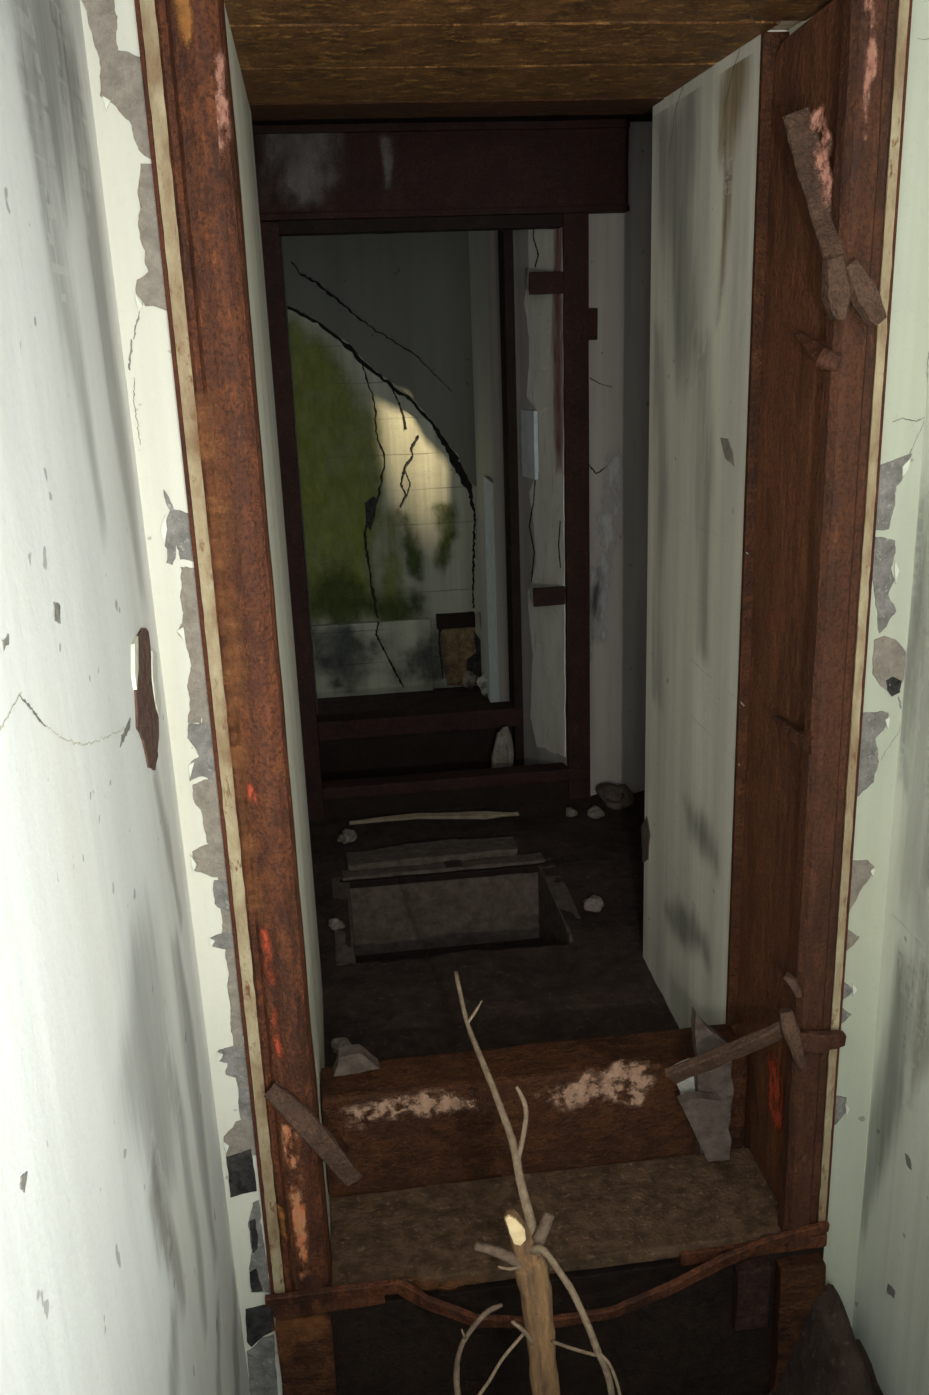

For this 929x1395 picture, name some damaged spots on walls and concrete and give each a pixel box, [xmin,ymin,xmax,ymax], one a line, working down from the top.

peeling [174,0,193,44]
peeling [81,0,167,311]
crack [287,261,476,687]
peeling [872,454,912,696]
crack [0,691,125,746]
spalling [120,628,161,770]
peeling [857,711,890,797]
peeling [849,860,875,912]
peeling [160,490,308,1395]
peeling [345,1090,474,1122]
peeling [553,1061,654,1110]